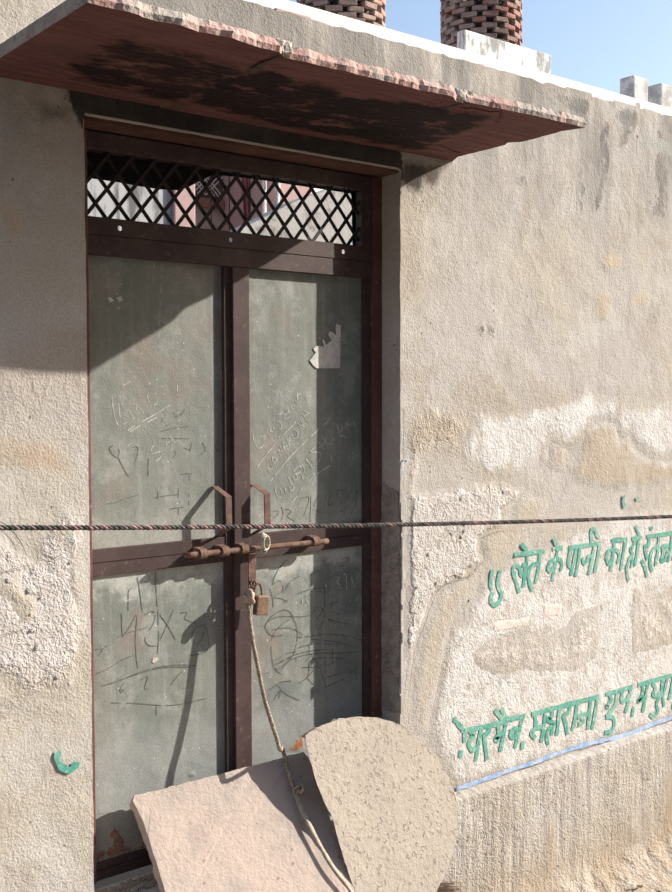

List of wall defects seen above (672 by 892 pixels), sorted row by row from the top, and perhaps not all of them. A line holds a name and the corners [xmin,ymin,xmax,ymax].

damp [546,87,643,221]
damp [648,152,672,224]
crack [0,521,64,573]
crack [0,627,63,683]
flaking render [0,500,90,703]
peeling [381,477,672,792]
corrosion [96,825,146,863]